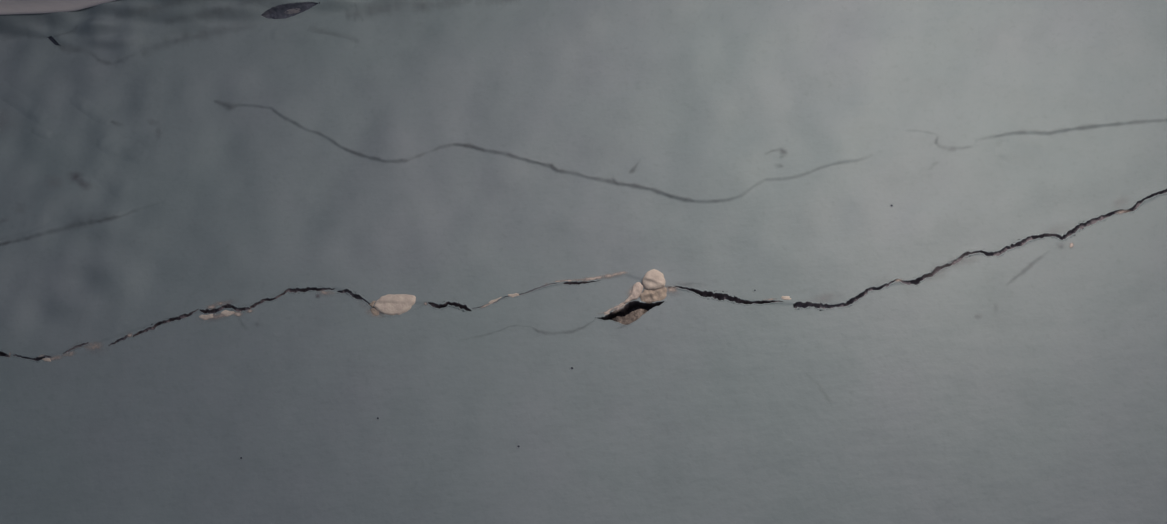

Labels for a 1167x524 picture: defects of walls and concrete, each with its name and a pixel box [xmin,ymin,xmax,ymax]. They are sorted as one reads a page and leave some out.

crack [668,187,1167,311]
crack [0,286,382,363]
spalling [369,294,416,316]
crack [425,272,625,313]
spalling [595,269,676,326]